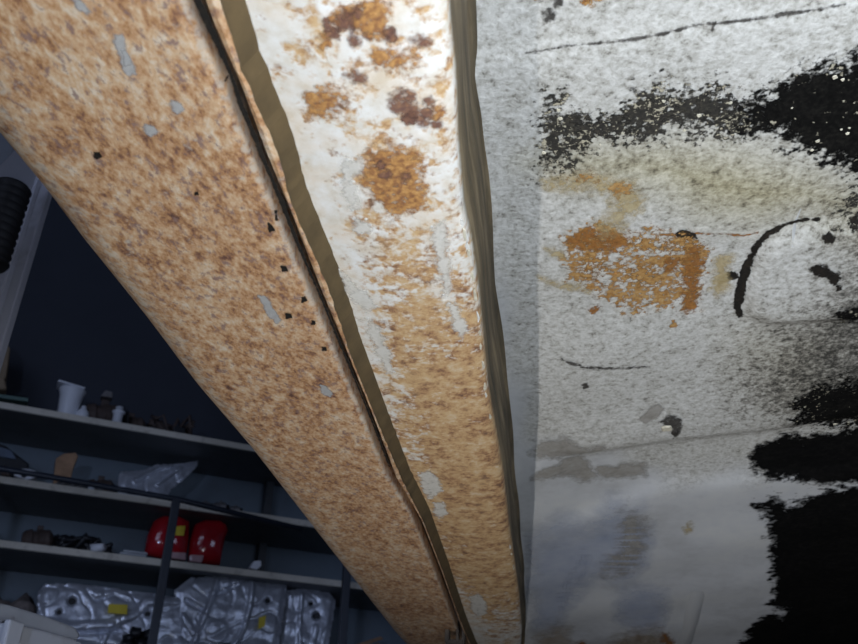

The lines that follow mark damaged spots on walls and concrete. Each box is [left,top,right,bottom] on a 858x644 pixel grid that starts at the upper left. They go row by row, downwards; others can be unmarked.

rust [316,0,433,73]
crack [526,4,846,53]
rust [302,83,348,119]
rust [343,70,367,84]
rust [389,87,446,128]
rust [359,139,430,219]
rust [539,174,732,315]
crack [656,217,820,318]